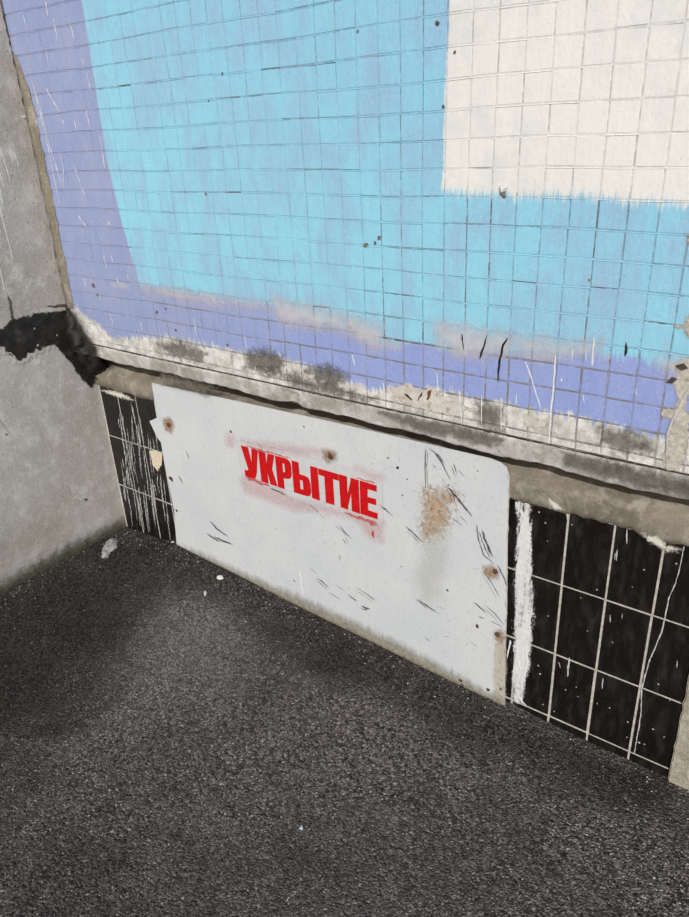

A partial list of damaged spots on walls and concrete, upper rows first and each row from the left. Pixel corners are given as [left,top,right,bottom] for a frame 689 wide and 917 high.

leakage [155,373,214,394]
leakage [244,335,373,401]
peeling [390,383,479,416]
spalling [661,356,689,472]